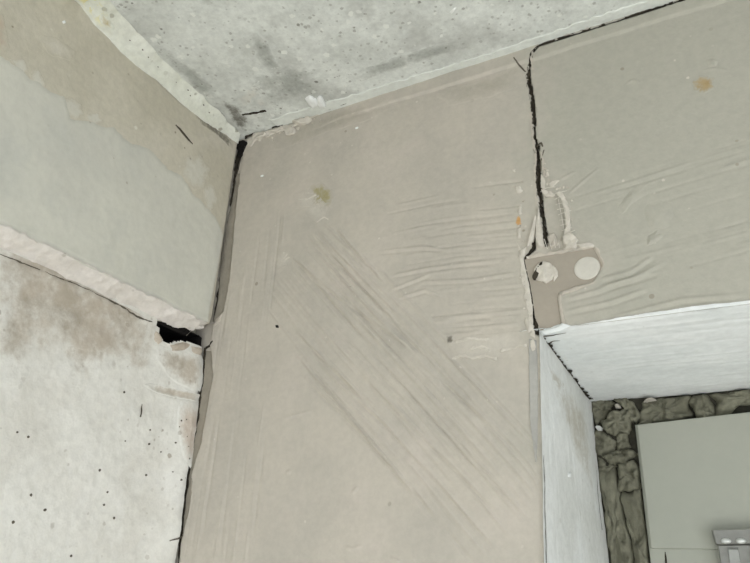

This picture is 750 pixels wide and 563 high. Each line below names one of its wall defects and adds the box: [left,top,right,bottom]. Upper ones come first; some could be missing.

peeling [0,56,240,330]
crack [229,140,248,213]
crack [513,0,684,400]
crack [213,257,224,321]
leakage [0,248,203,468]
crack [194,340,213,442]
crack [169,467,191,563]